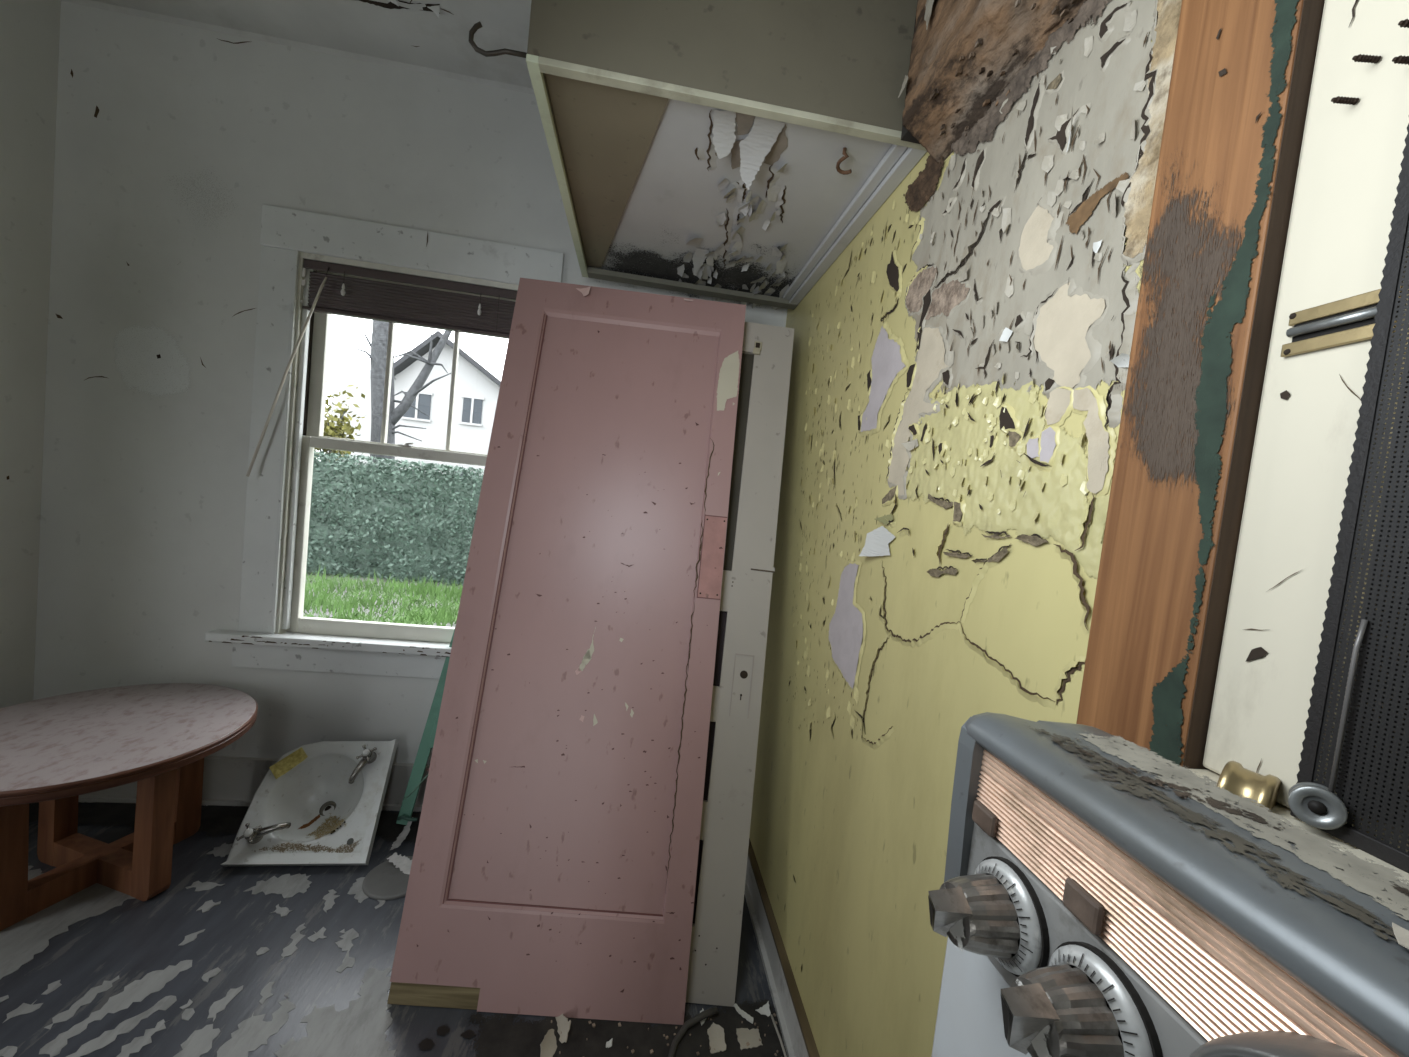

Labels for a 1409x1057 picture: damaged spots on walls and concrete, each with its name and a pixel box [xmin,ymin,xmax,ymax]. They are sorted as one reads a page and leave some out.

crack [345,0,452,18]
peeling [677,109,789,310]
crack [788,49,1158,750]
peeling [828,0,1182,692]
damp [1112,136,1246,493]
peeling [0,873,396,1057]